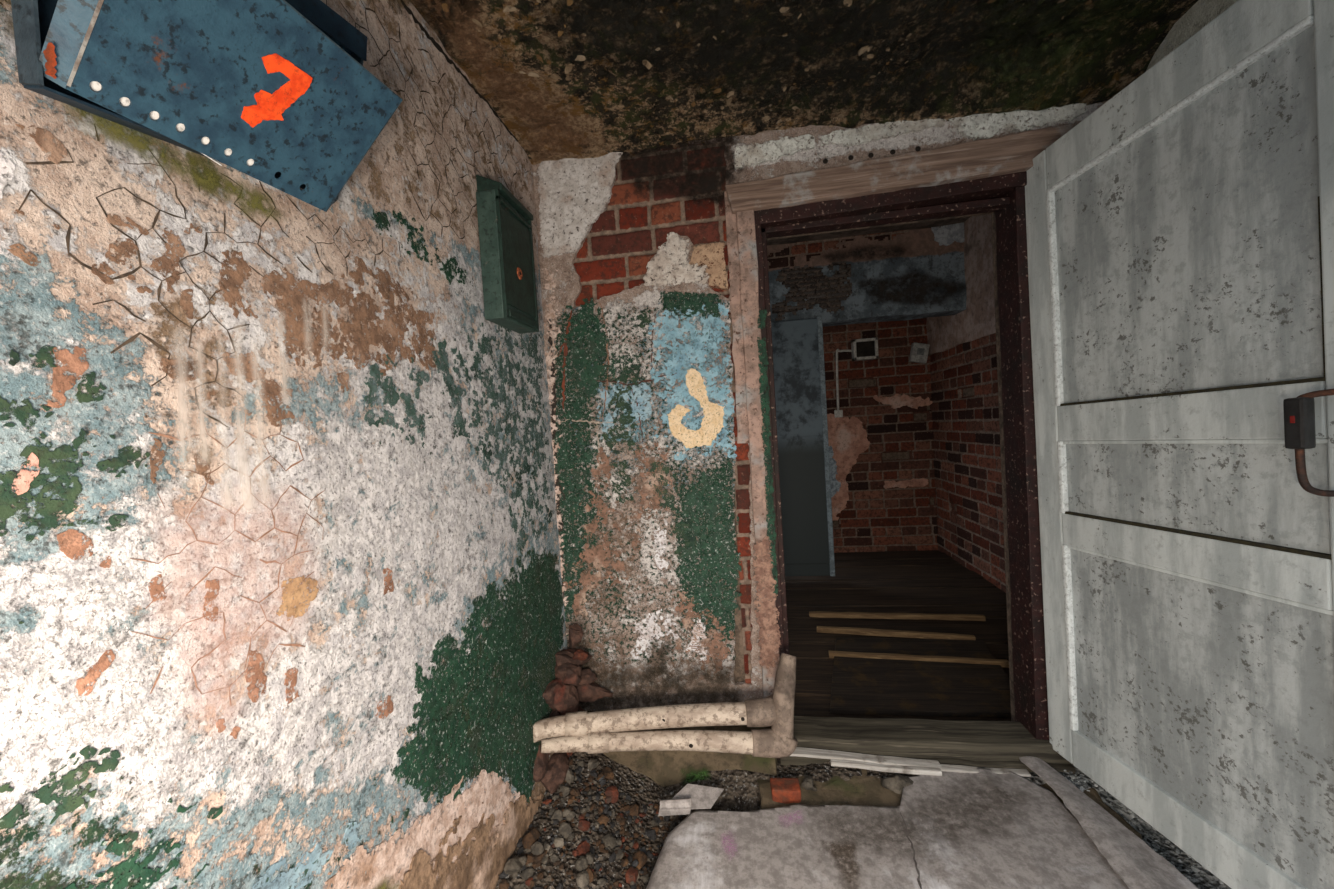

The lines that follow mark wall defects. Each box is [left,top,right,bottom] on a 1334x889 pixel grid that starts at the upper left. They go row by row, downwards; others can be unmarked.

water stain [415,0,587,158]
water stain [527,0,1163,118]
peeling [91,214,202,319]
peeling [0,345,165,568]
crack [16,124,401,706]
peeling [214,68,1087,889]
peeling [148,574,166,603]
peeling [203,579,220,621]
peeling [75,650,115,696]
peeling [0,746,125,832]
peeling [65,829,210,889]
peeling [167,798,223,819]